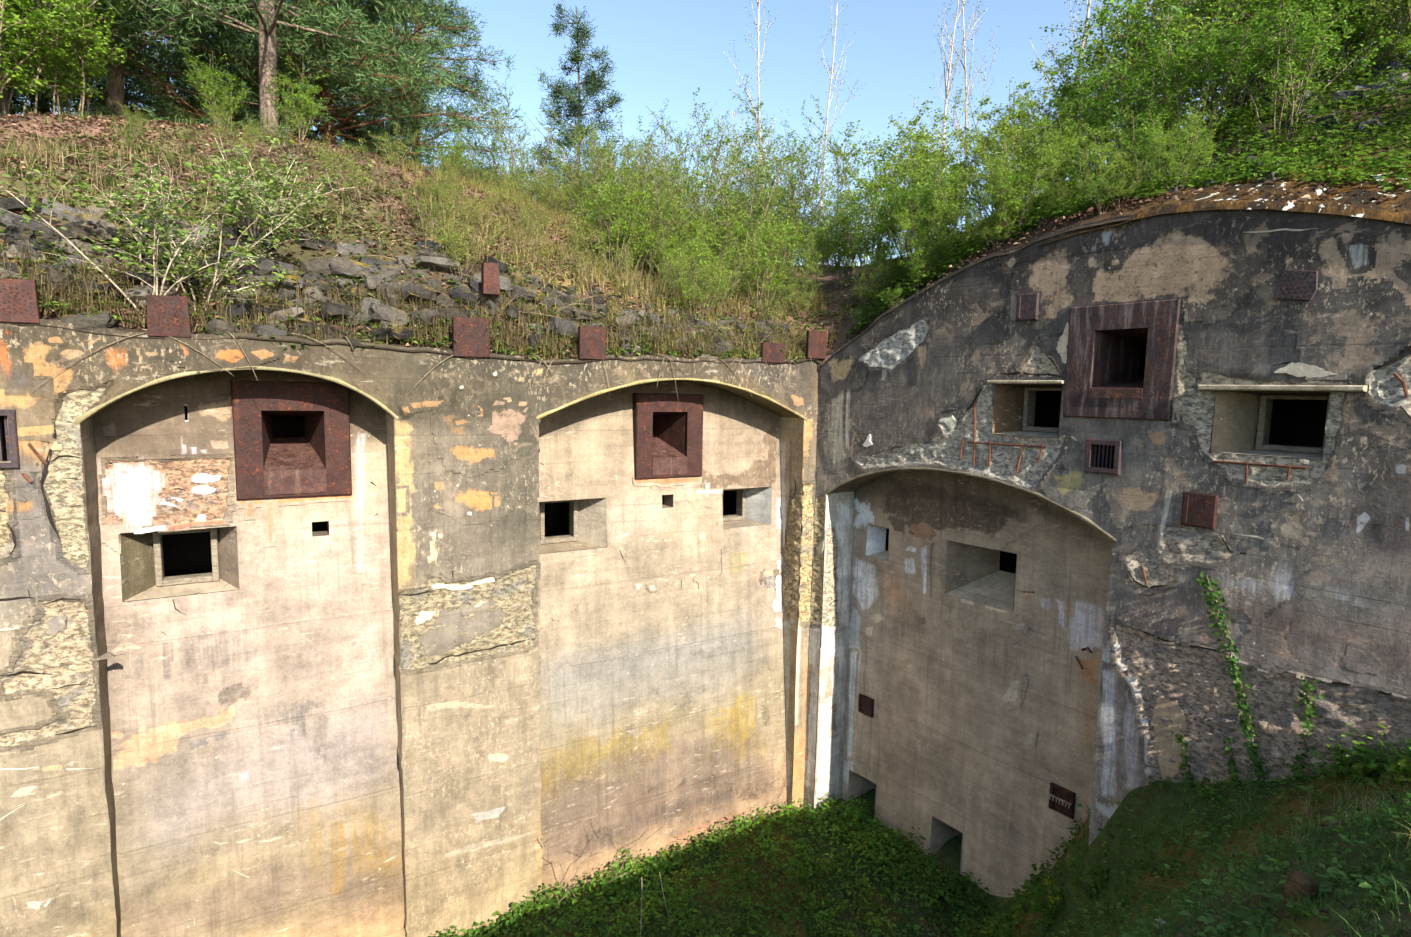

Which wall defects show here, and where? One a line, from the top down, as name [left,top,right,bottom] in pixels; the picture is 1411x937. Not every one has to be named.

peeling [0,319,256,575]
spalling [385,360,550,676]
peeling [683,389,839,635]
spalling [819,314,932,398]
peeling [851,201,1411,595]
spalling [0,593,334,786]
spalling [1107,593,1411,787]